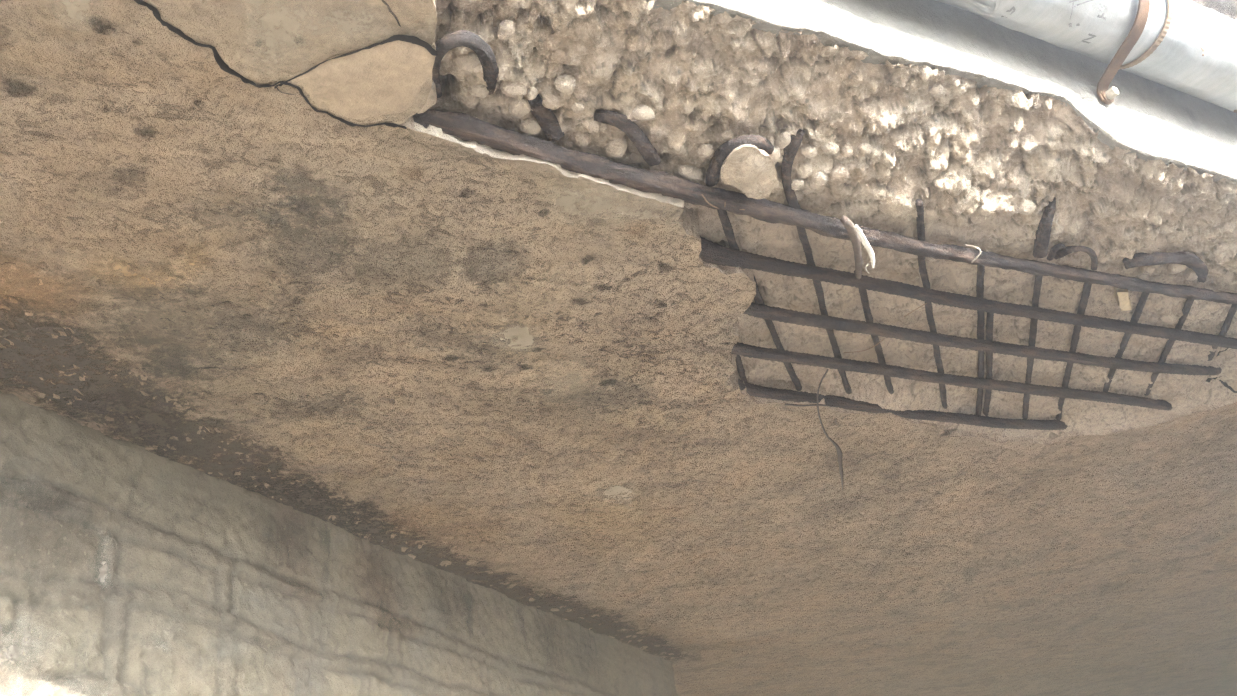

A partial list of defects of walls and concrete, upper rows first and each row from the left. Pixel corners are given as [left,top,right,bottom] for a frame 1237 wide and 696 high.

crack [134,0,438,129]
spalling [388,0,1237,445]
leakage [0,297,694,661]